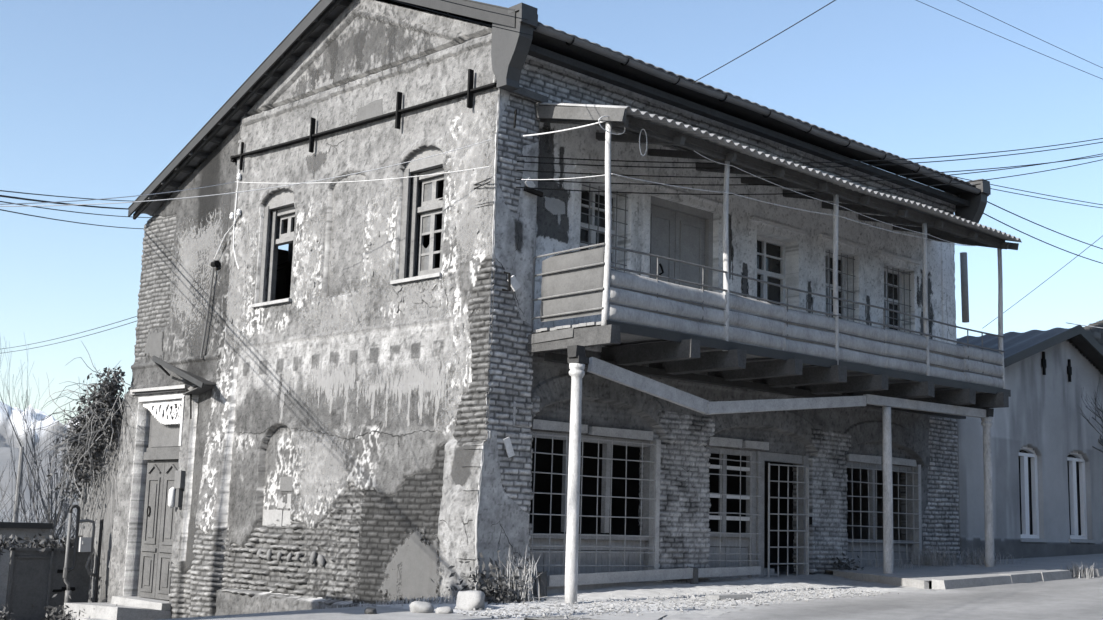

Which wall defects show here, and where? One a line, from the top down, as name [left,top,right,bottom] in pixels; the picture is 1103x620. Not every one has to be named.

flaking render [166,59,960,619]